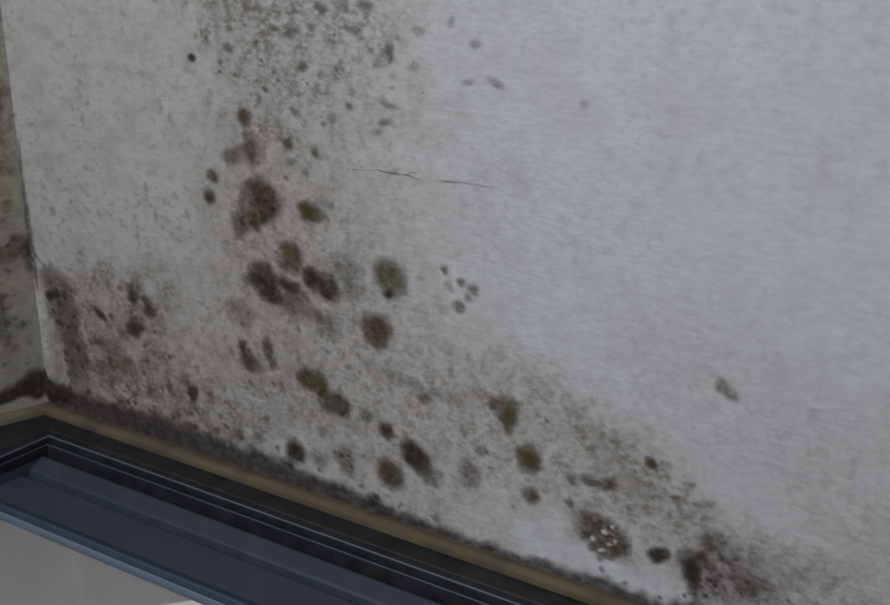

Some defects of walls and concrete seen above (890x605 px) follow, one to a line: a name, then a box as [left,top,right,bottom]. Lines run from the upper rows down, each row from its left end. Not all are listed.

damp [242,2,302,44]
damp [238,109,248,124]
damp [205,171,217,202]
damp [229,179,350,315]
damp [376,263,403,297]
damp [0,269,660,605]
damp [648,534,771,605]